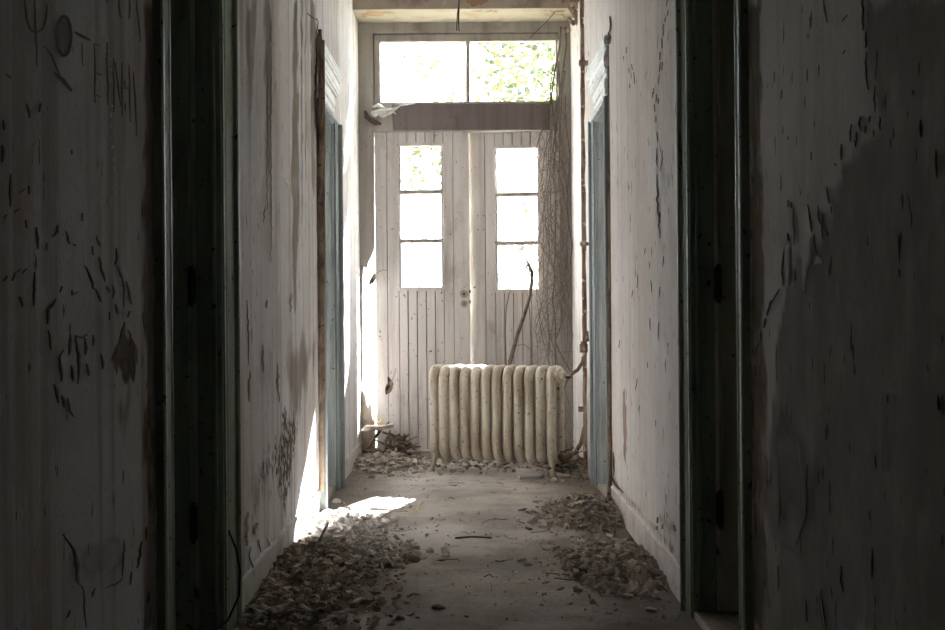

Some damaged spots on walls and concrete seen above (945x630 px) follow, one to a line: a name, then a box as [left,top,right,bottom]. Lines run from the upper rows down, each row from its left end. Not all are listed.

peeling [652,0,669,142]
peeling [781,187,832,294]
flaking render [46,236,138,417]